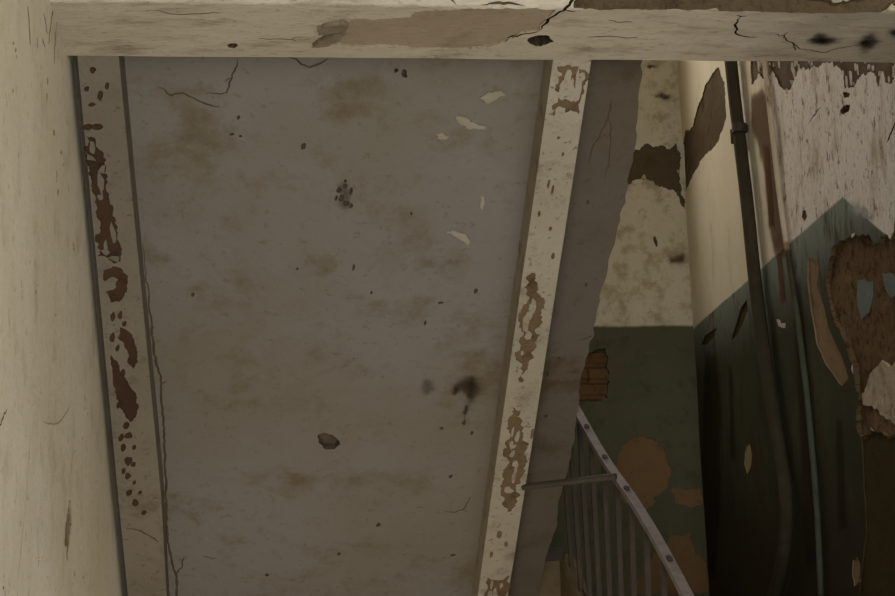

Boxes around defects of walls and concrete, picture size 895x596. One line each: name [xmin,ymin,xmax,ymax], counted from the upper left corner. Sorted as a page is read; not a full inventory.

peeling [312,8,555,50]
crack [505,0,574,42]
spalling [574,0,895,14]
peeling [552,65,590,116]
peeling [750,61,895,98]
peeling [627,67,726,209]
peeling [82,124,147,515]
peeling [515,273,545,382]
spalling [807,222,895,439]
peeling [500,408,534,512]
peeling [616,435,703,511]
peeling [666,533,709,594]